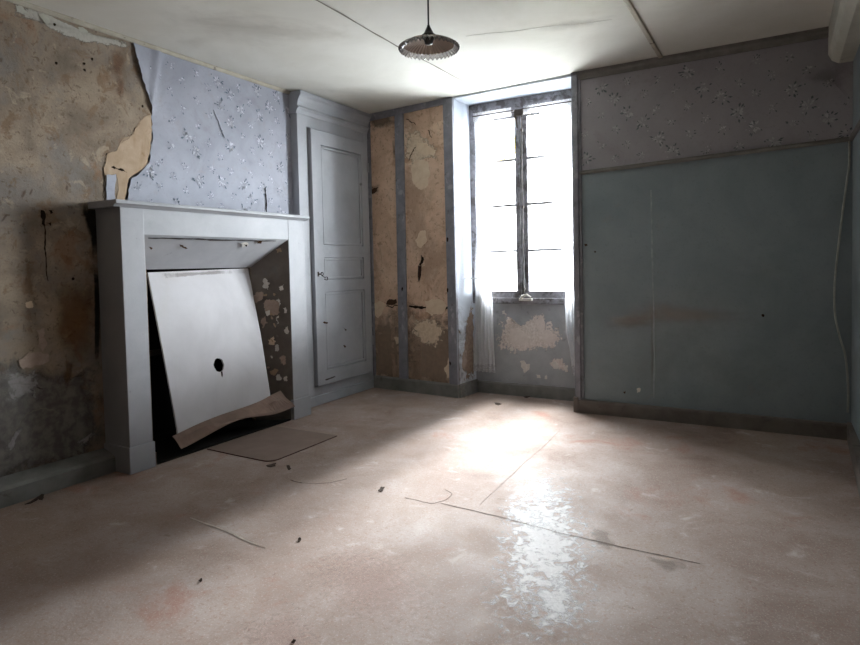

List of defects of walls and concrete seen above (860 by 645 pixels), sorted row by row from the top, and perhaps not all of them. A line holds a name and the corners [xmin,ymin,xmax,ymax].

peeling [405,130,437,190]
leakage [61,274,100,354]
peeling [253,278,289,381]
peeling [496,310,568,379]
leakage [0,362,101,477]